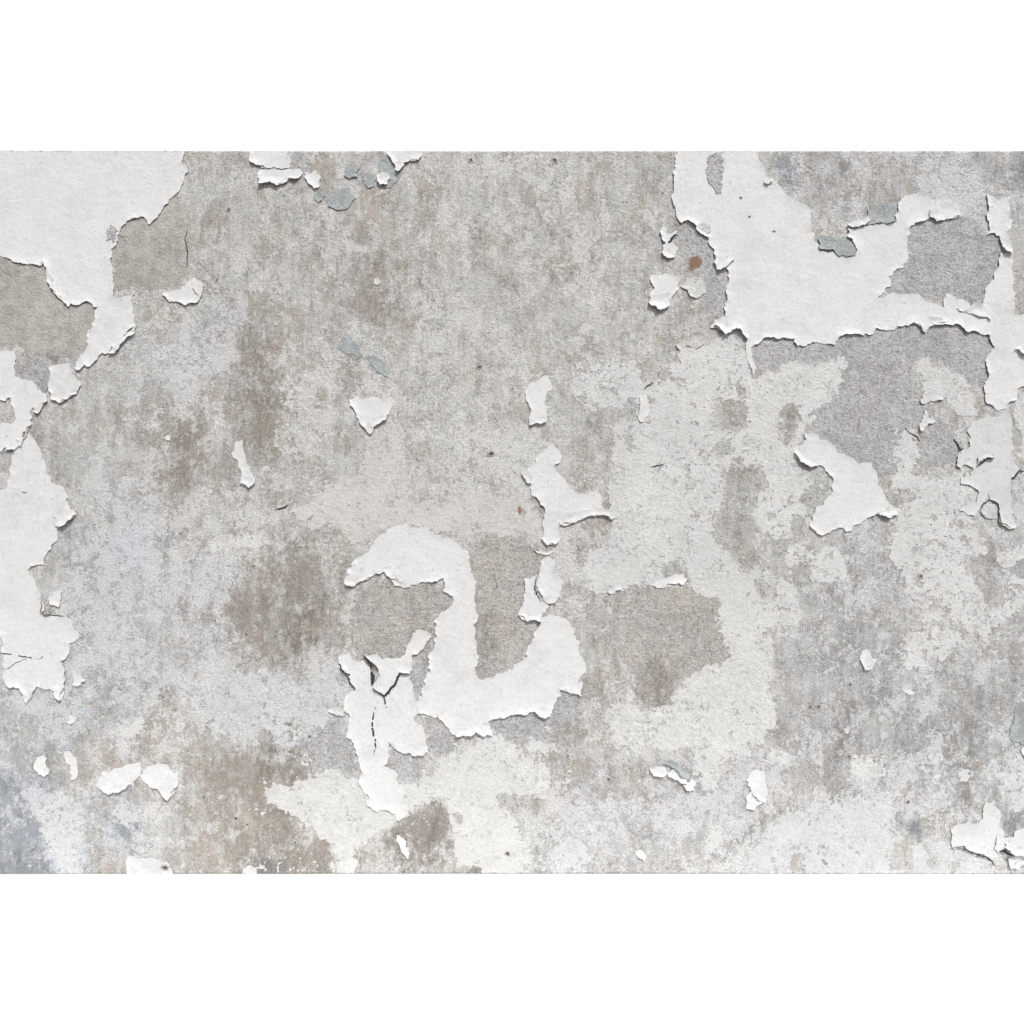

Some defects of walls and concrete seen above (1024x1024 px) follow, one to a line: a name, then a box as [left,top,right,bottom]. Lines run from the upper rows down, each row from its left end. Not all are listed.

peeling [0,150,204,703]
peeling [96,762,179,829]
crack [339,656,409,752]
peeling [204,150,1024,874]